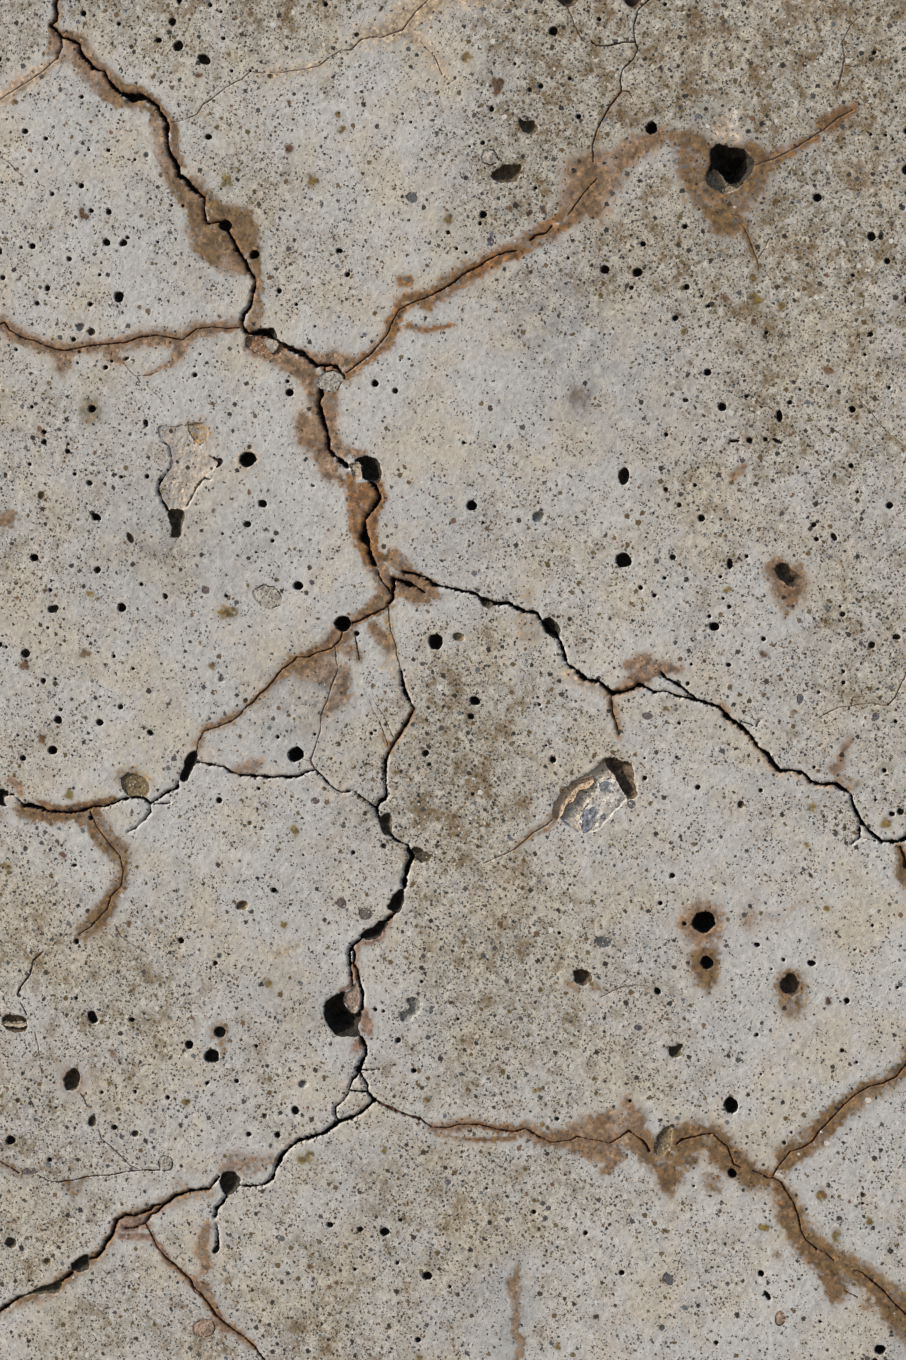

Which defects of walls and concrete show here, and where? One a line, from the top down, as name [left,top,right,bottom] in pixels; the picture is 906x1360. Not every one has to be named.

crack [0,0,906,956]
spalling [552,756,638,834]
crack [0,936,906,1360]
damp [475,1229,557,1360]